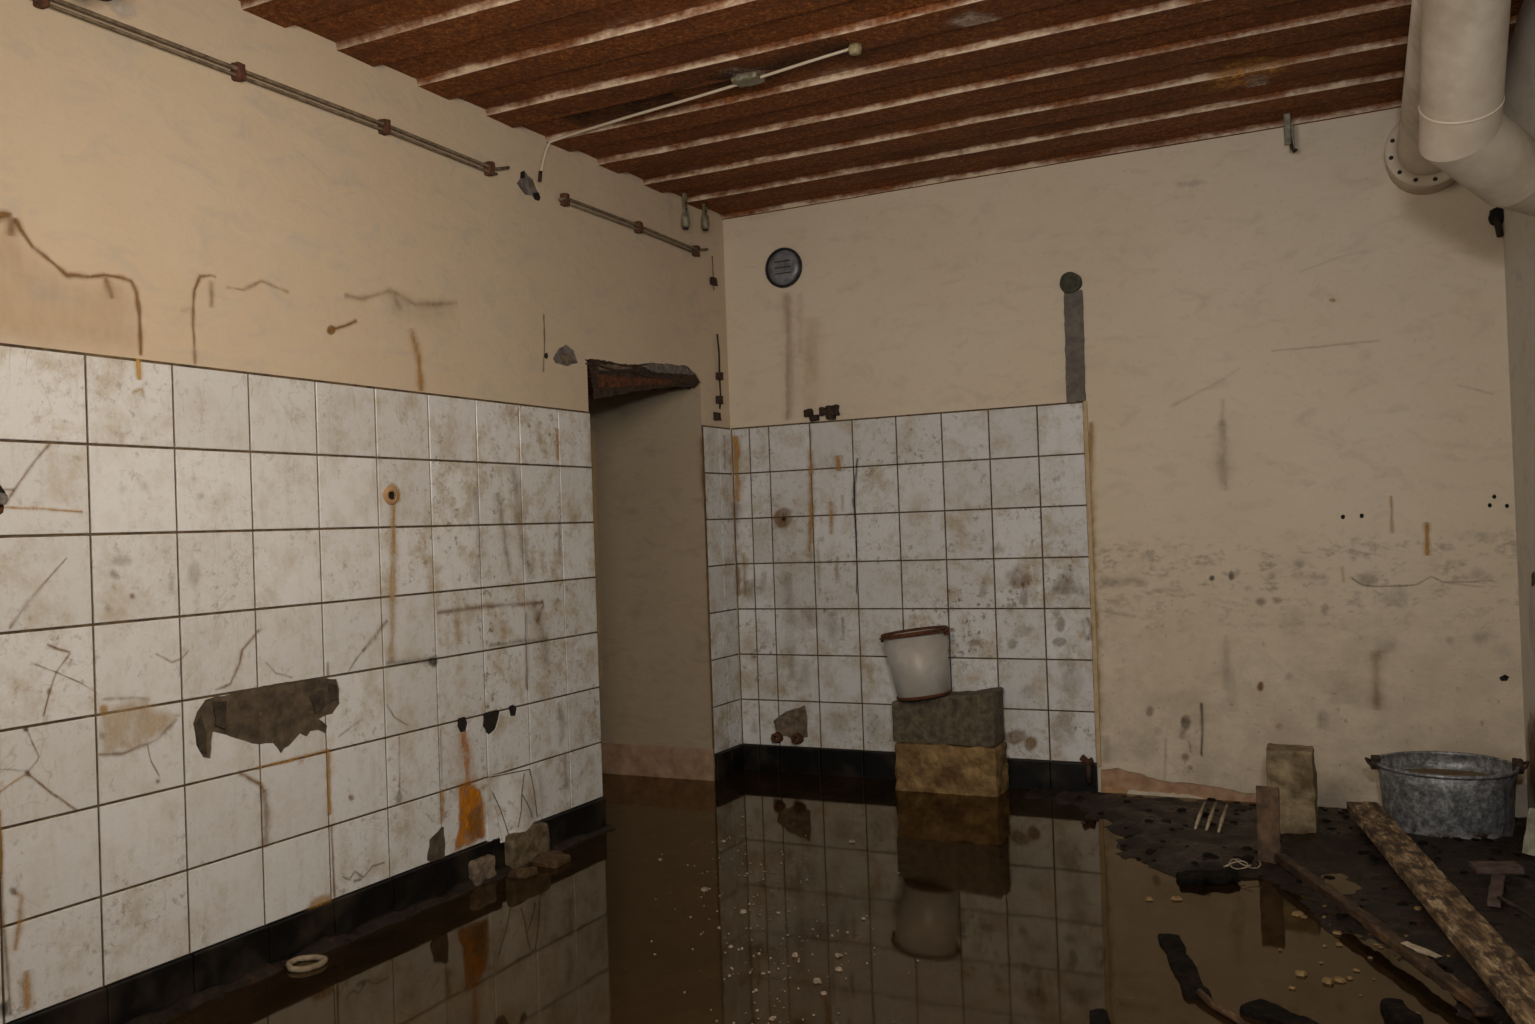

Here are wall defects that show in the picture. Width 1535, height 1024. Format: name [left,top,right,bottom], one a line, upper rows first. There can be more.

damp [0,212,142,354]
rust [388,484,400,659]
rust [774,511,788,527]
rust [809,452,832,550]
crack [12,645,79,808]
spalling [193,678,339,759]
spalling [427,827,445,862]
rust [441,731,485,848]